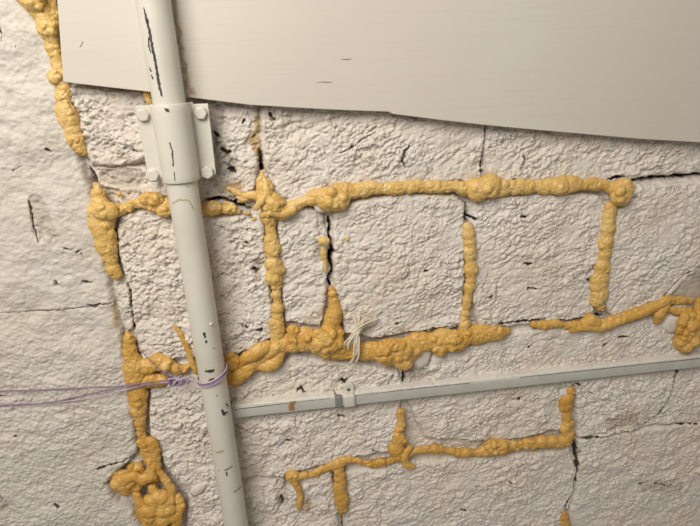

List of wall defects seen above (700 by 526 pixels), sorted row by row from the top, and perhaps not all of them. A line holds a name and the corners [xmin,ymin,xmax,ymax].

crack [607,172,698,181]
crack [28,200,38,242]
crack [327,215,335,286]
crack [572,435,603,481]